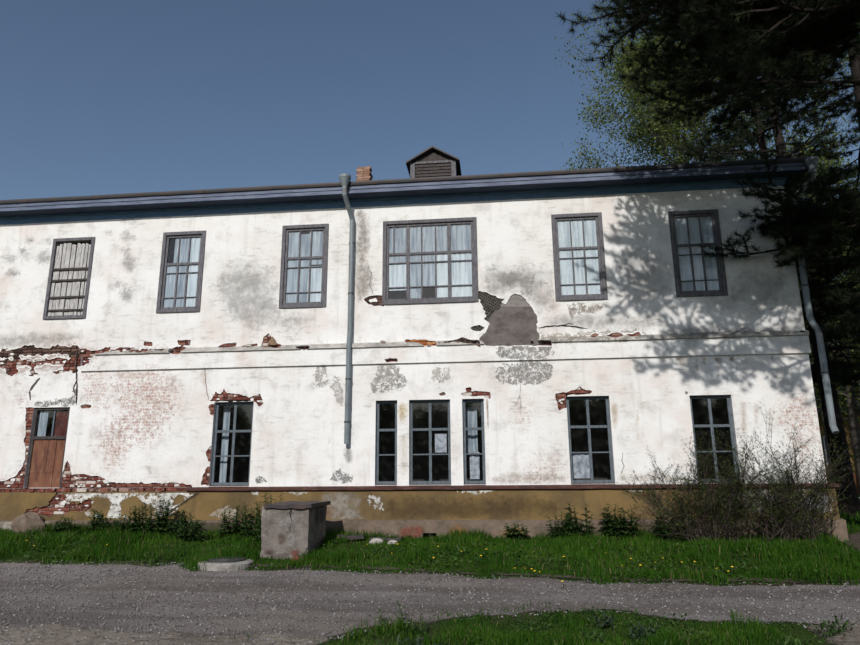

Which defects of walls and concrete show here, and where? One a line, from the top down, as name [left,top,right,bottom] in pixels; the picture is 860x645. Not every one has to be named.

spalling [364,296,384,307]
flaking render [405,294,643,385]
spalling [0,340,197,376]
peeling [370,359,406,395]
spalling [209,390,263,416]
spalling [555,386,592,410]
spalling [0,389,91,489]
spalling [25,447,211,519]